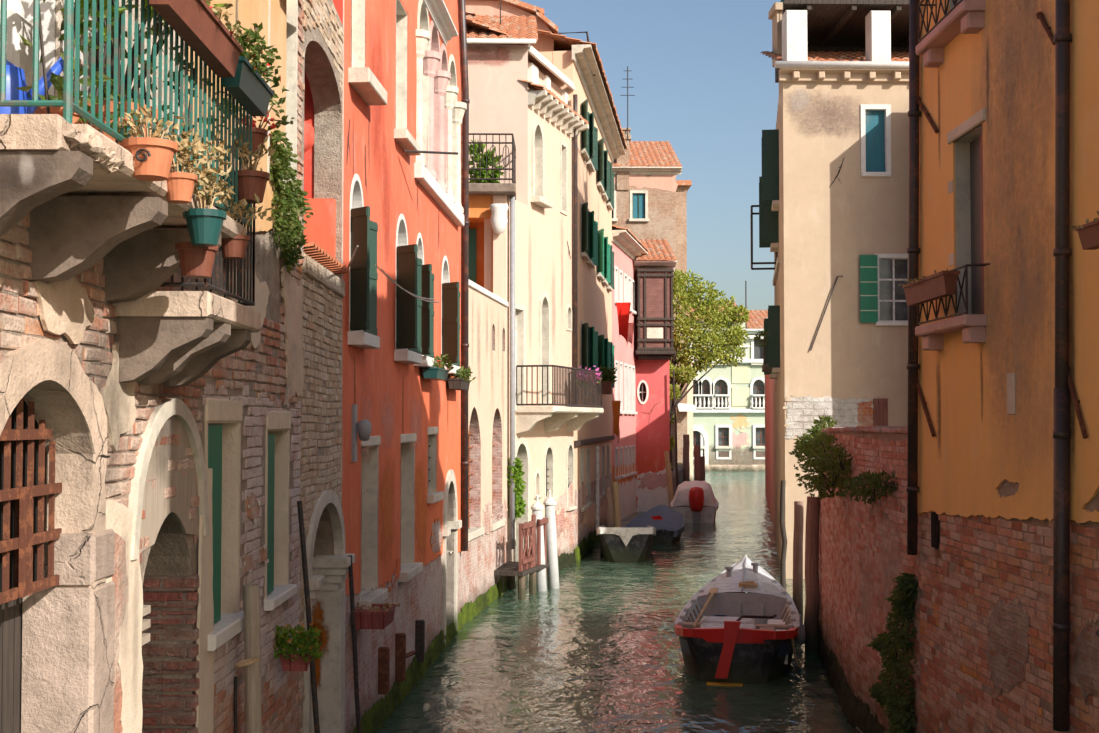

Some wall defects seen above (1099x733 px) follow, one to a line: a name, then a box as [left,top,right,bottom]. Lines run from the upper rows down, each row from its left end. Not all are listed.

flaking render [998,479,1020,498]
flaking render [1085,491,1099,513]
rust [312,601,329,687]
spalling [1073,617,1099,705]